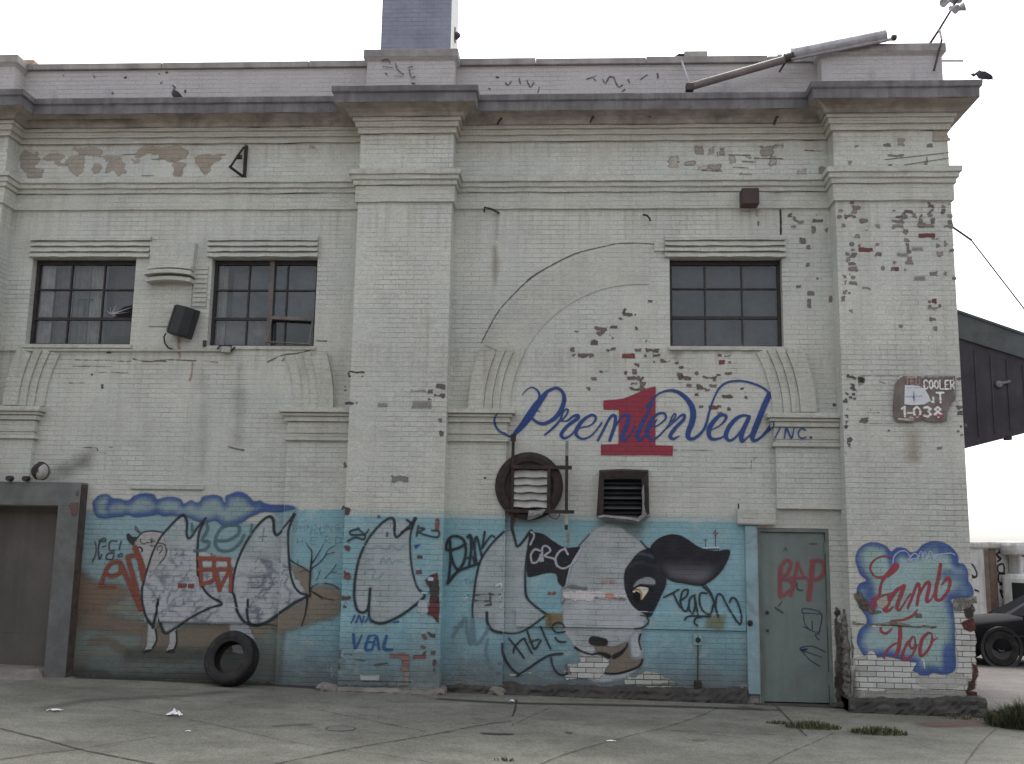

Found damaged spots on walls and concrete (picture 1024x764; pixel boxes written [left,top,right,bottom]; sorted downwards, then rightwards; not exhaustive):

peeling [19,145,225,179]
peeling [667,143,783,175]
peeling [883,130,957,166]
peeling [787,213,828,249]
peeling [829,201,957,313]
peeling [570,308,748,414]
flaking render [338,544,440,687]
flaking render [563,655,609,680]
flaking render [834,597,978,702]